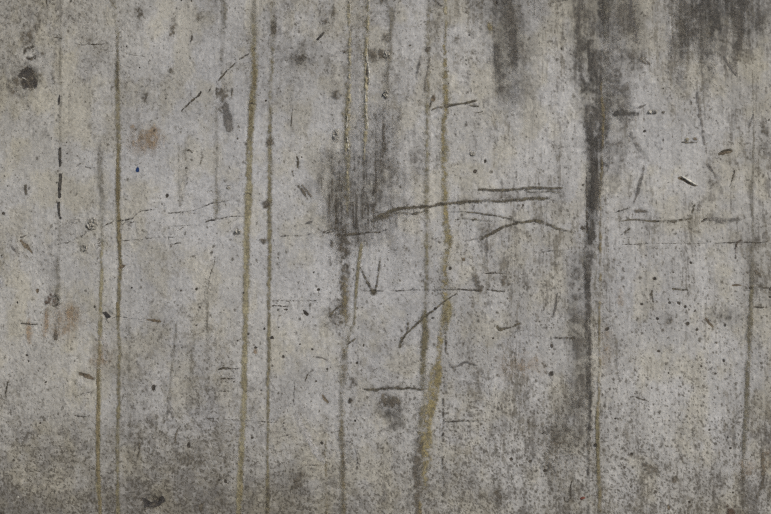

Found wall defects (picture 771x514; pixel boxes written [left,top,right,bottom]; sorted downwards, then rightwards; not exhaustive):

damp [492,0,523,93]
damp [675,0,765,66]
damp [321,125,393,325]
damp [572,0,636,511]